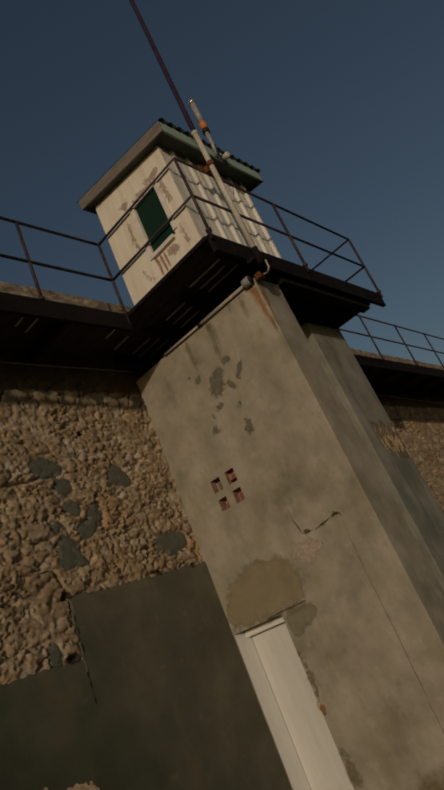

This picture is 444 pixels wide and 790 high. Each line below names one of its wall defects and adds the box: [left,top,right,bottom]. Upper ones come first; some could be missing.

crack [283,501,444,733]
spalling [67,781,100,790]